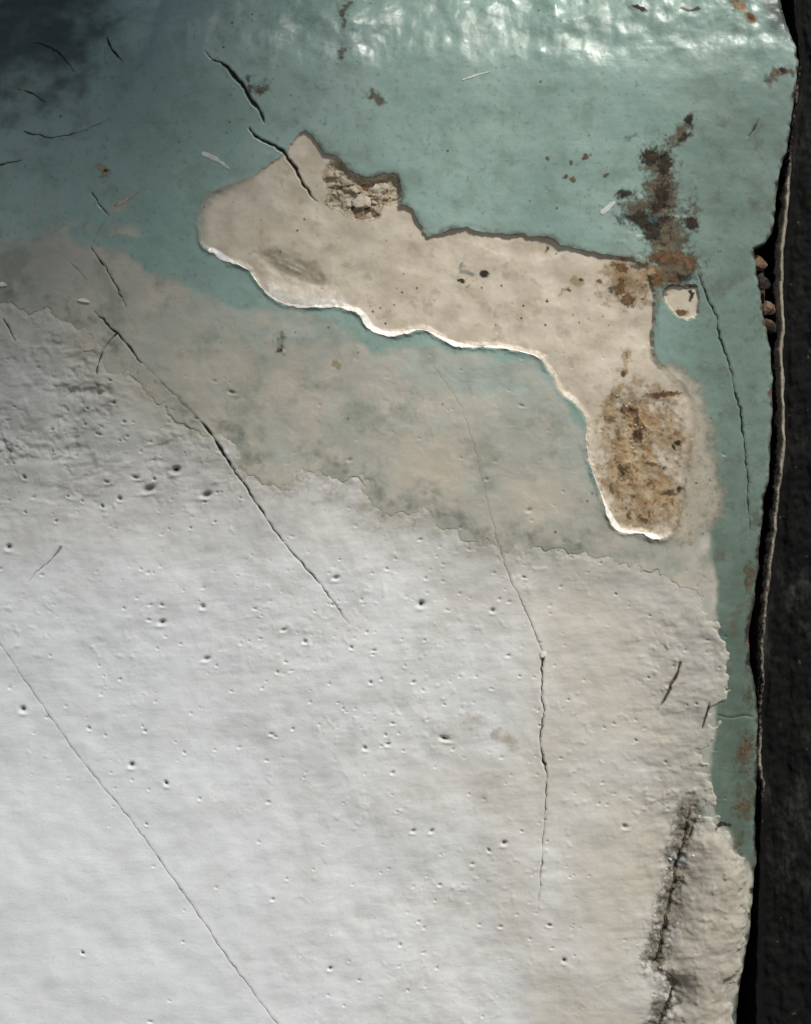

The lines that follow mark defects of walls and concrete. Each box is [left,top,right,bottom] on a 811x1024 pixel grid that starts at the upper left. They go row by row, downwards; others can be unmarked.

crack [71,193,126,306]
crack [96,316,342,615]
crack [206,52,316,201]
peeling [201,131,722,545]
corrosion [595,351,692,529]
corrosion [597,113,707,319]
crack [699,276,750,523]
crack [429,360,547,898]
crack [657,663,681,710]
crack [0,644,278,1024]